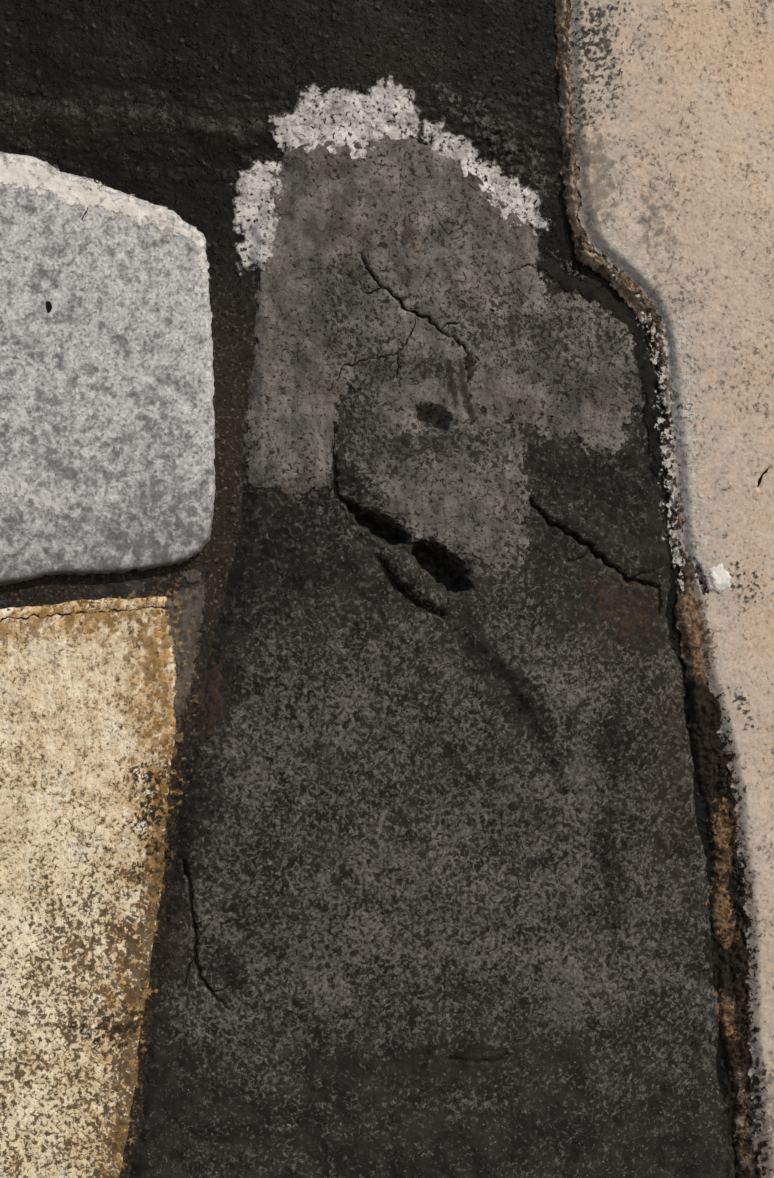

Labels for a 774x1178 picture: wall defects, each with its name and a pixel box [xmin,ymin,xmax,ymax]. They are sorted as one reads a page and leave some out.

crack [336,255,467,380]
crack [331,425,348,507]
crack [529,499,663,615]
crack [183,860,235,1009]